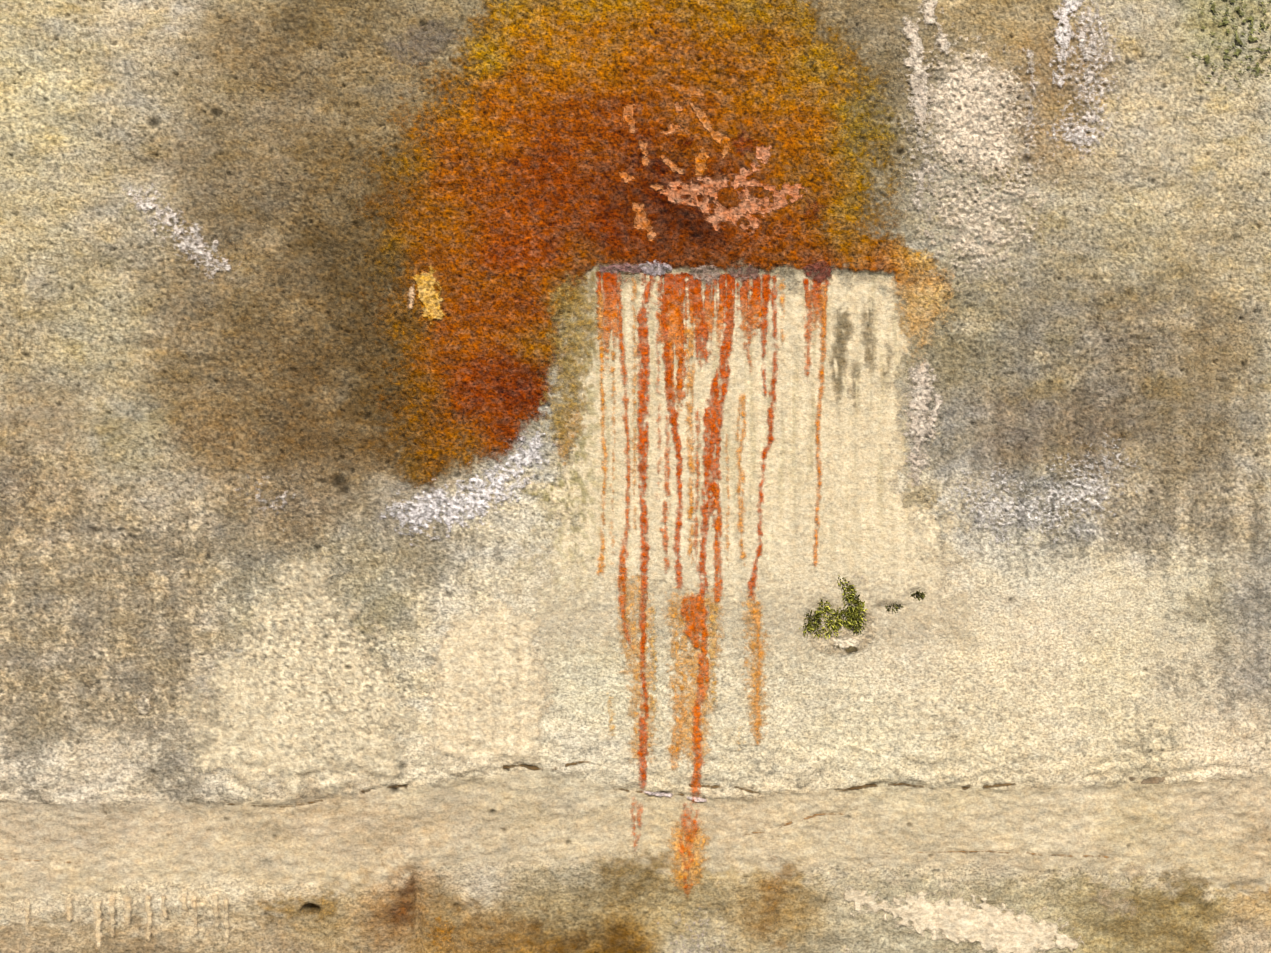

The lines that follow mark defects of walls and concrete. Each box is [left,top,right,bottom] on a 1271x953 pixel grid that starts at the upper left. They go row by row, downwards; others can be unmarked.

damp [0,445,40,572]
damp [0,514,417,799]
rust [365,0,952,890]
damp [128,0,1271,772]
spalling [832,637,860,649]